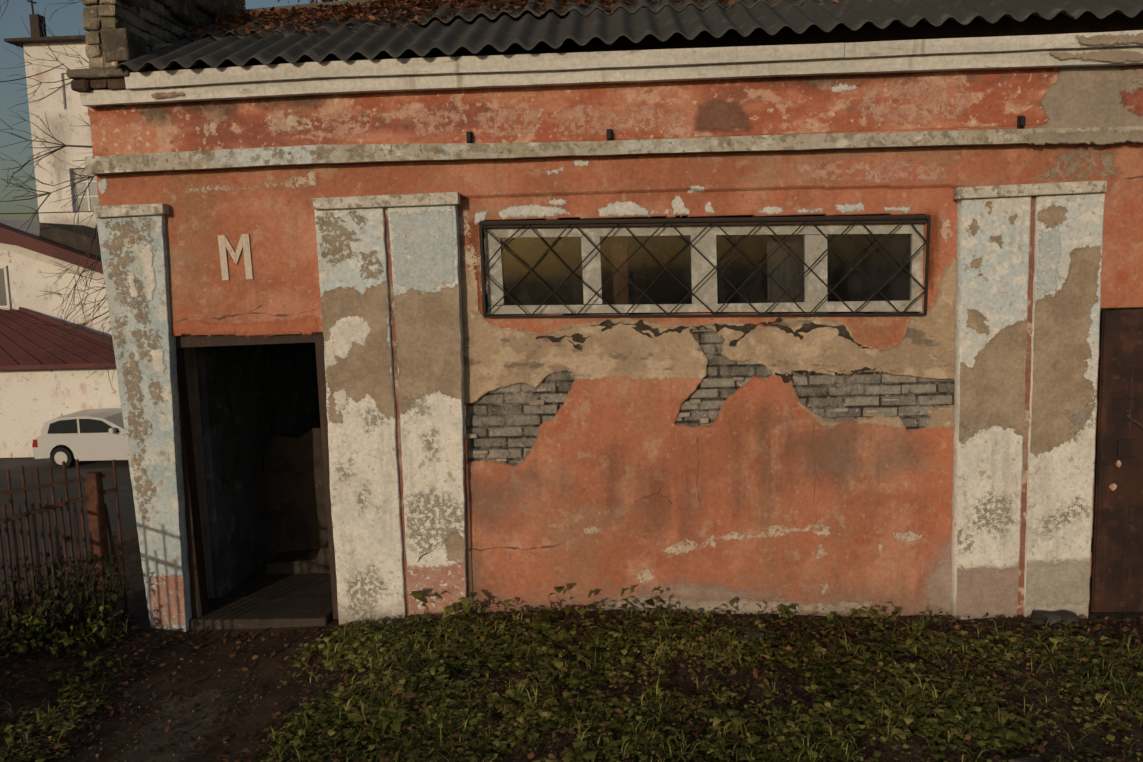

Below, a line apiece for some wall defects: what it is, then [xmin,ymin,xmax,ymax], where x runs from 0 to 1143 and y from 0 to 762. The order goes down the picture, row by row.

peeling [268,108,371,140]
peeling [411,105,539,138]
peeling [555,103,688,136]
peeling [830,74,971,125]
peeling [546,159,589,175]
peeling [598,185,715,217]
flaking render [102,197,1102,520]
peeling [406,493,466,619]
crack [469,541,566,551]
peeling [957,493,1014,551]
peeling [149,575,186,627]
peeling [347,566,386,616]